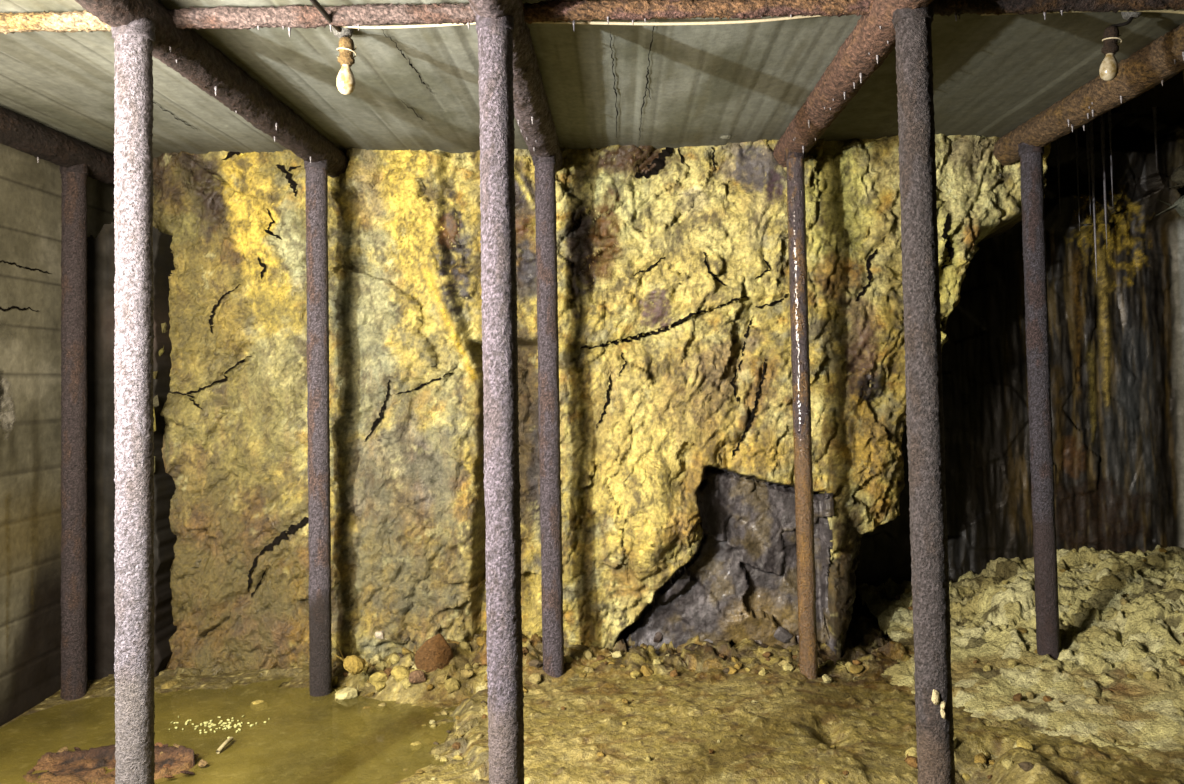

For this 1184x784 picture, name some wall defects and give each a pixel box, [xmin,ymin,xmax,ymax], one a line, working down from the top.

crack [0,260,52,274]